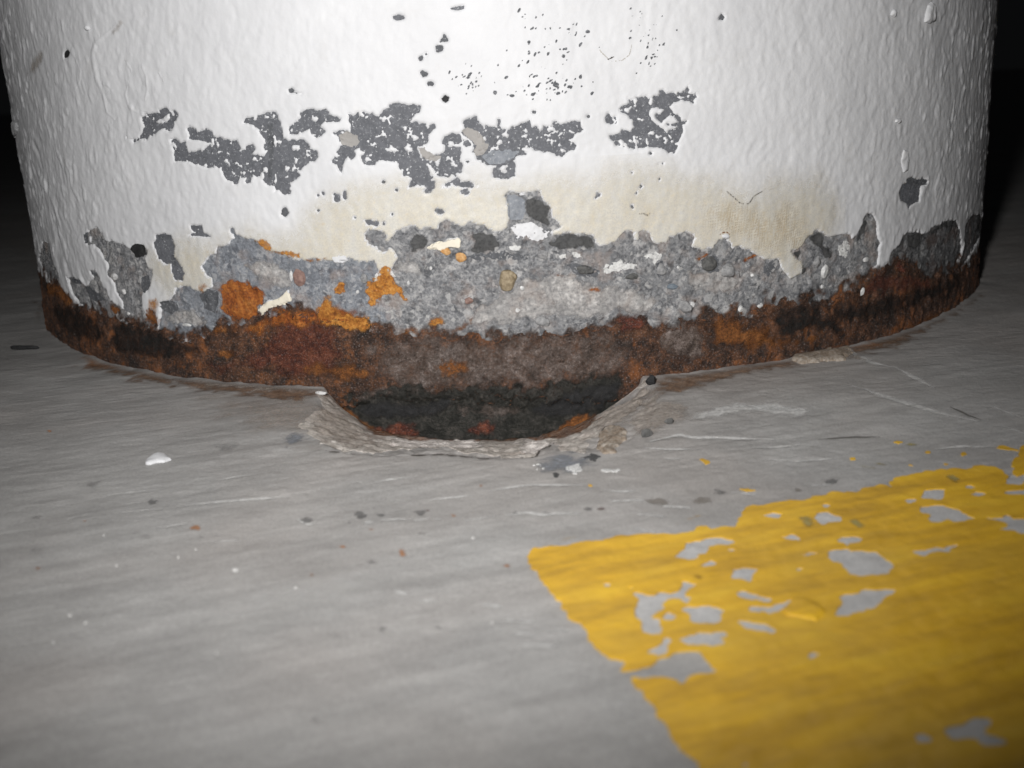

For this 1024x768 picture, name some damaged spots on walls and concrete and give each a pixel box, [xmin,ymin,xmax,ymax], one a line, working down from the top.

spalling [40,8,981,341]
corrosion [37,246,980,440]
peeling [905,475,985,522]
peeling [1005,475,1024,494]
peeling [675,538,734,566]
peeling [801,504,893,576]
peeling [913,545,958,556]
peeling [988,515,1024,533]
peeling [633,582,727,661]
peeling [731,568,791,633]
peeling [835,589,895,616]
peeling [944,718,1007,746]